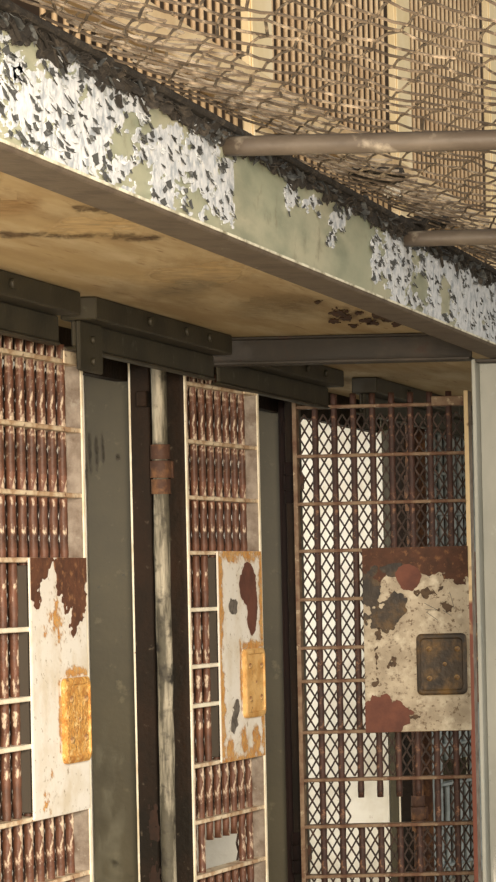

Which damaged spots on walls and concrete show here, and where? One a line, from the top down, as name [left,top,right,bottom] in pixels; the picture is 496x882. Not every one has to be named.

peeling [0,11,496,343]
corrosion [30,558,87,643]
corrosion [218,551,266,763]
corrosion [362,546,468,634]